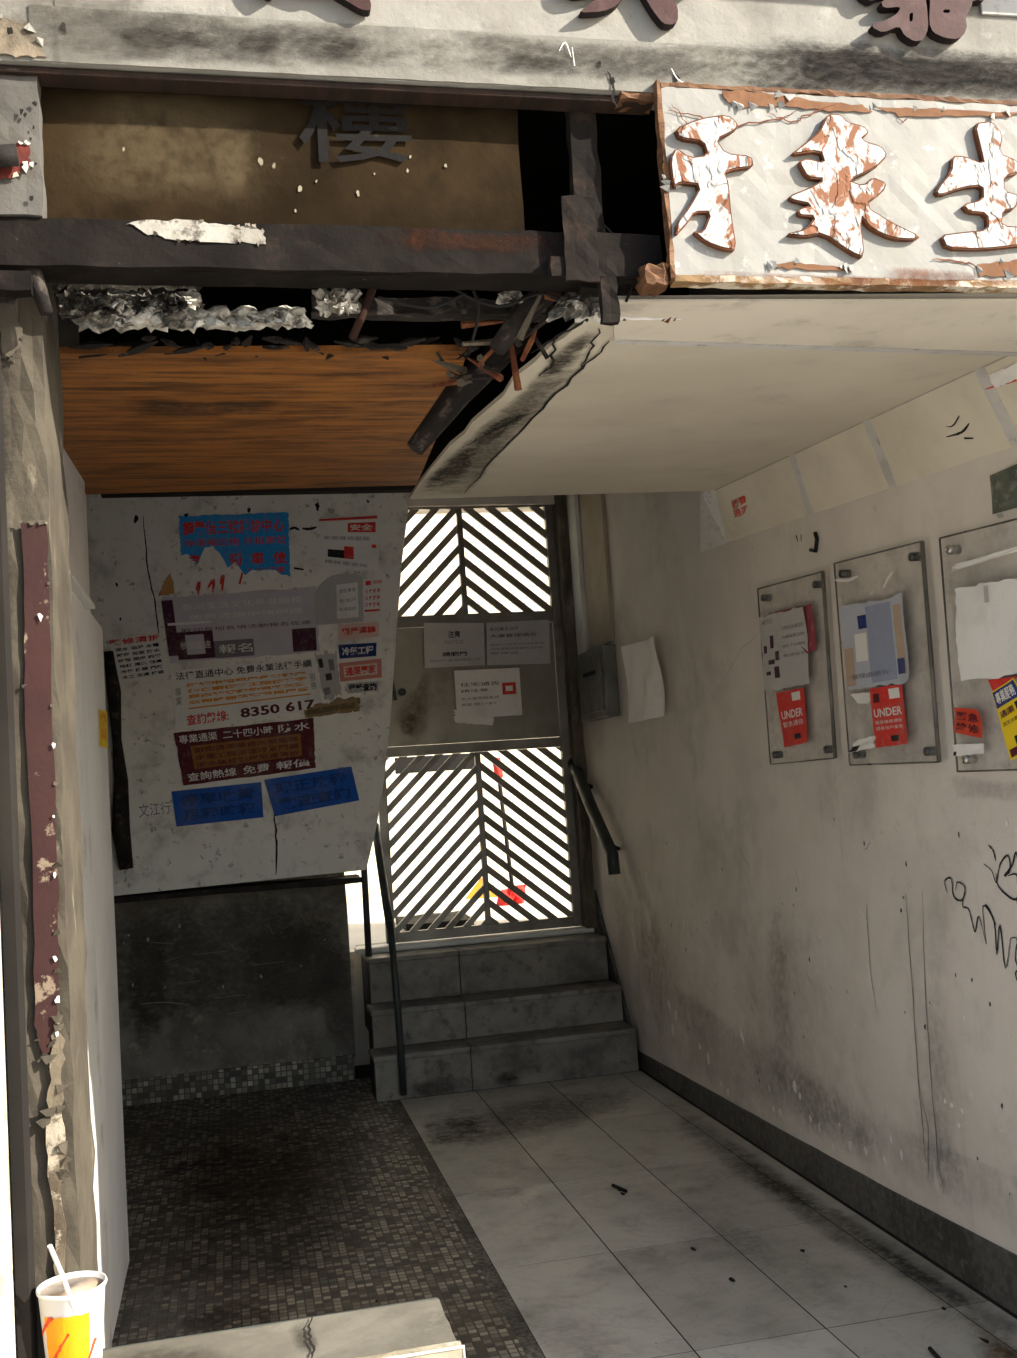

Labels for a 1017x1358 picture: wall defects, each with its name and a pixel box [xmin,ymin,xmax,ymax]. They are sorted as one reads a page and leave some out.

spalling [0,13,47,59]
damp [805,50,1017,86]
spalling [53,283,362,334]
spalling [496,291,523,305]
crack [307,1316,316,1358]